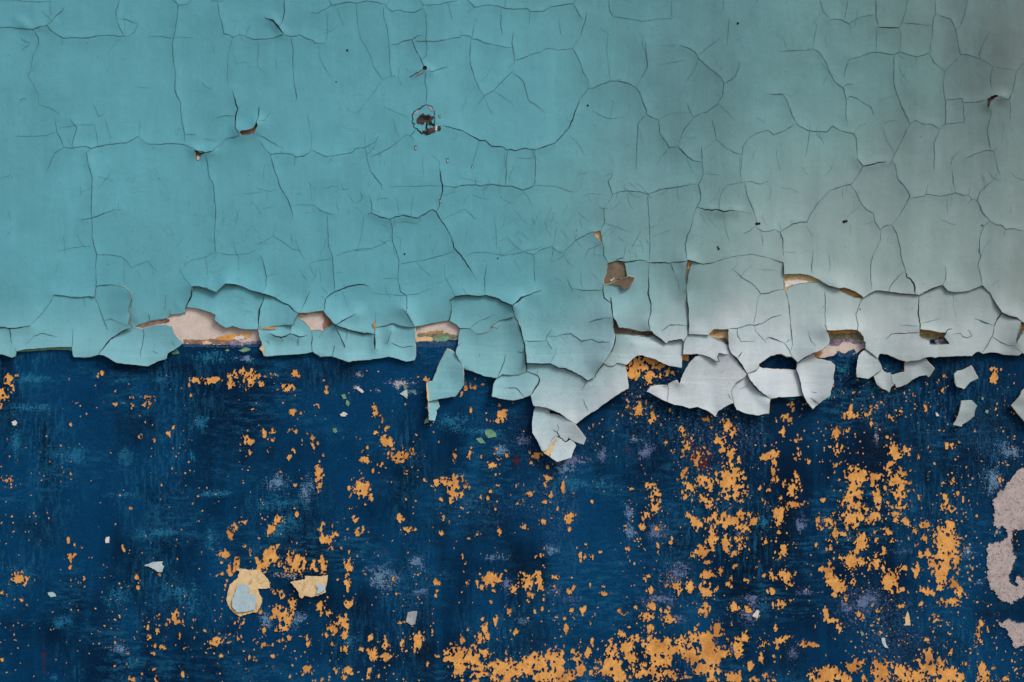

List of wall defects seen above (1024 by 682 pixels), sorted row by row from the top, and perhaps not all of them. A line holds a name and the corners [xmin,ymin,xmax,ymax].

spalling [412,104,441,150]
crack [0,0,1024,410]
peeling [0,254,1024,462]